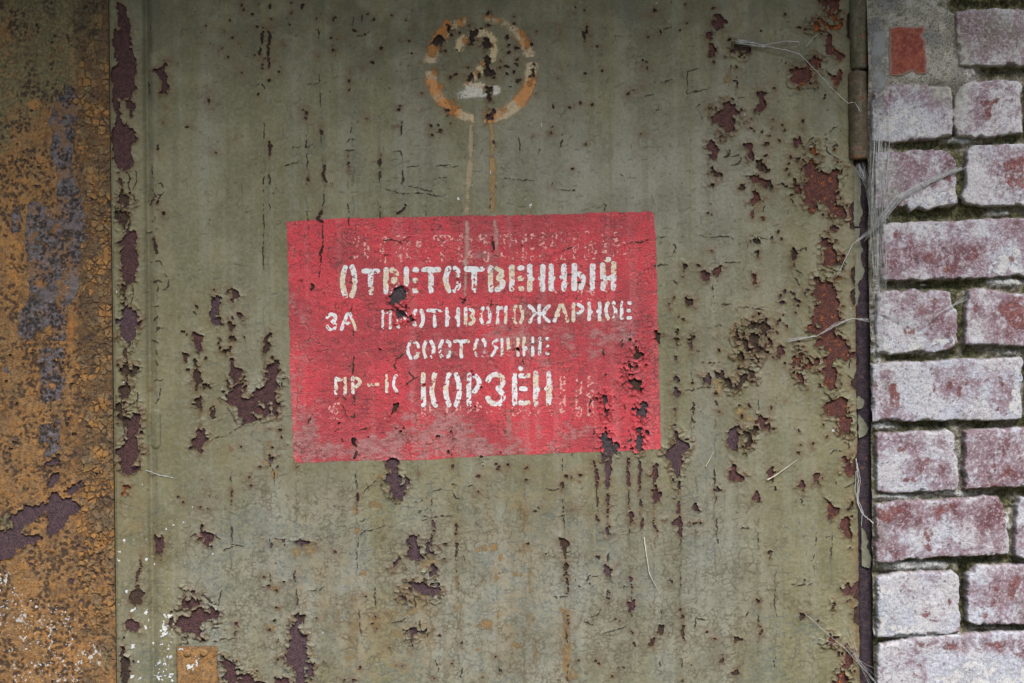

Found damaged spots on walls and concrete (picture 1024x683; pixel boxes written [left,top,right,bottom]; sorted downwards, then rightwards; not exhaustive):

peeling [781,0,845,100]
peeling [0,84,87,560]
peeling [110,2,149,498]
peeling [654,262,724,361]
peeling [700,87,856,481]
peeling [180,287,289,485]
peeling [383,457,410,501]
peeling [588,338,650,461]
peeling [660,424,691,481]
peeling [168,590,220,642]
peeling [218,606,324,683]
peeling [393,499,447,647]